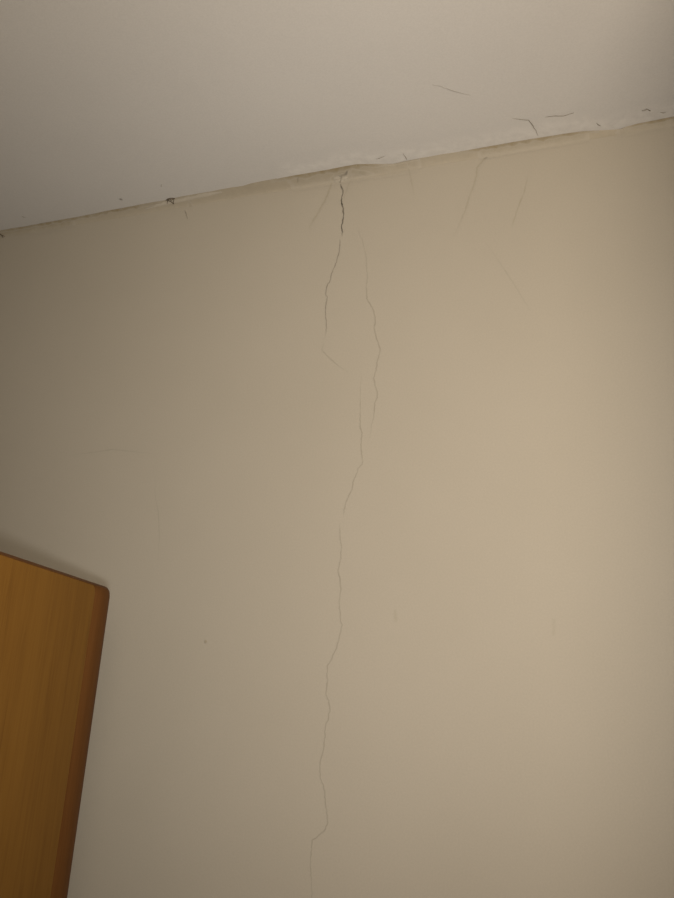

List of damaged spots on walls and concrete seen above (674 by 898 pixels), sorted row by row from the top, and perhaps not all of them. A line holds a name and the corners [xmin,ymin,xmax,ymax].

crack [309,168,381,898]